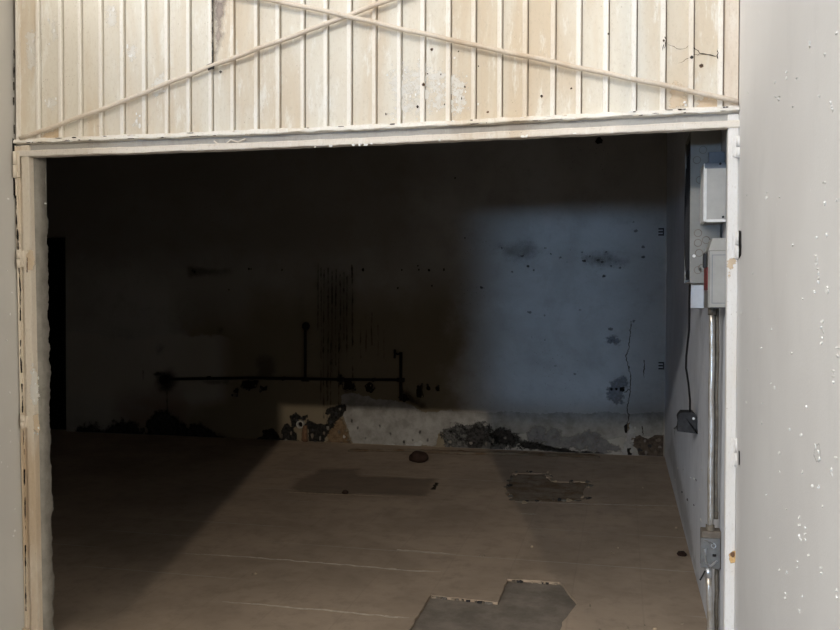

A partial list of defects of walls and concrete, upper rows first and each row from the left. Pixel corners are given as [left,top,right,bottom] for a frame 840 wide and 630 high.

crack [662,37,718,62]
crack [624,325,645,434]
peeling [257,404,358,444]
flaking render [624,423,664,456]
peeling [504,470,594,504]
peeling [411,580,576,630]